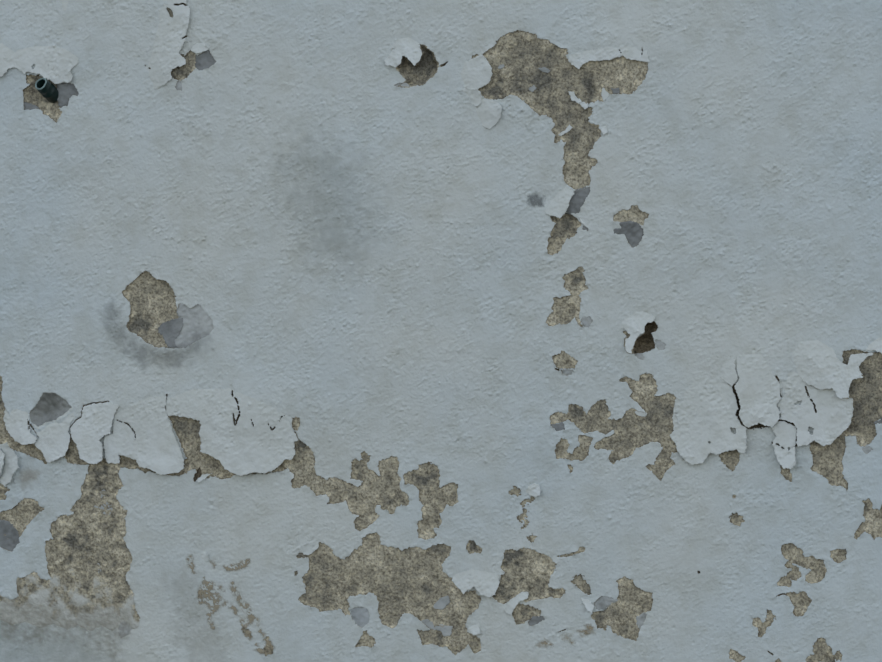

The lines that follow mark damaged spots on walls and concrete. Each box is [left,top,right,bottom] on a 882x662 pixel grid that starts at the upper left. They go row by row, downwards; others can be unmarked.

peeling [0,43,79,122]
peeling [145,0,216,90]
flaking render [384,37,448,88]
peeling [460,30,649,255]
peeling [123,271,214,348]
peeling [546,267,593,327]
peeling [550,337,882,490]
peeling [0,376,653,656]
peeling [854,499,882,539]